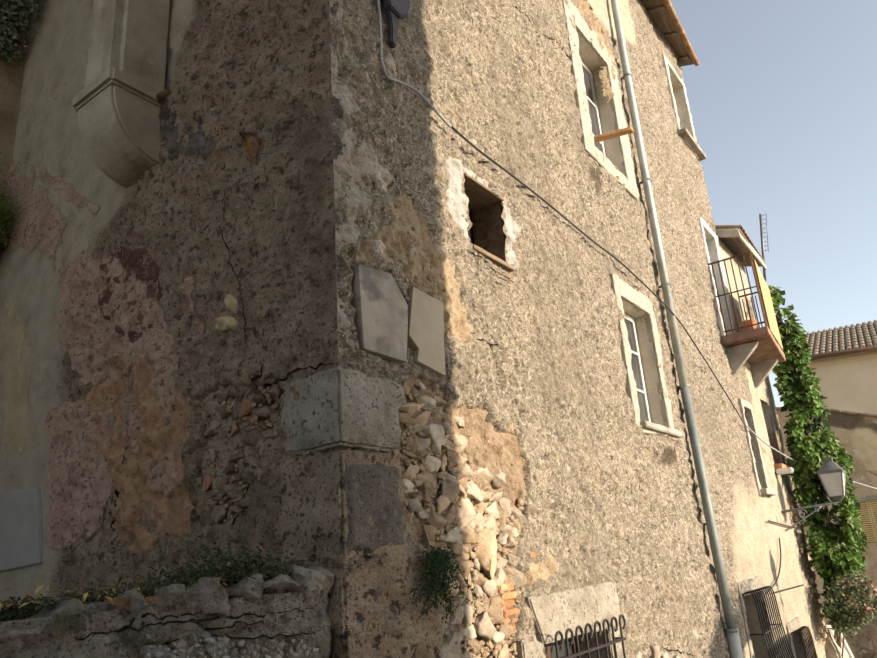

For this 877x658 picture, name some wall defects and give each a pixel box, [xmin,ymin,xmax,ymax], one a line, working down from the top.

flaking render [327,0,473,343]
crack [75,593,333,658]